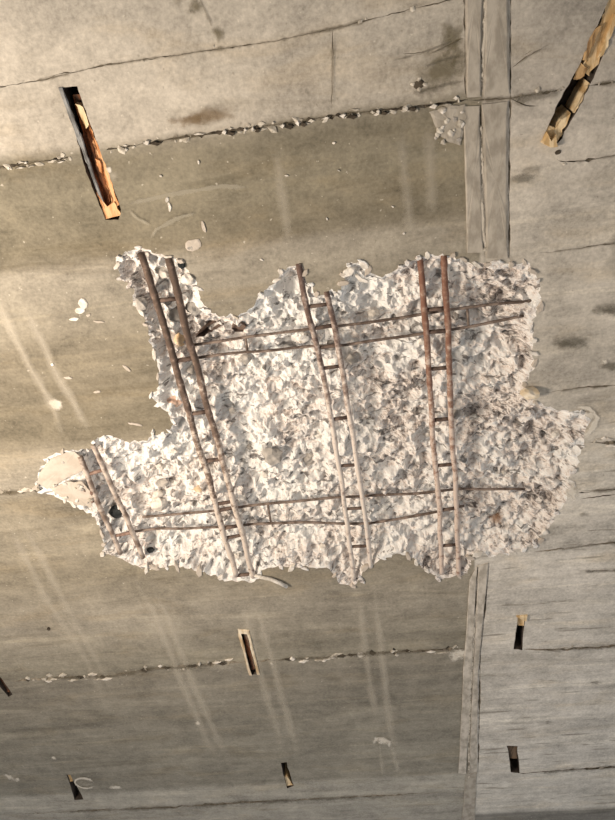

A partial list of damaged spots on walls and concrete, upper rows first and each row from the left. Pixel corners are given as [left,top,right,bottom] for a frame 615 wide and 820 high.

crack [0,0,565,259]
crack [556,155,613,166]
peeling [185,221,206,251]
spalling [32,246,591,588]
crack [525,644,615,654]
crack [18,565,489,779]
crack [522,766,615,774]